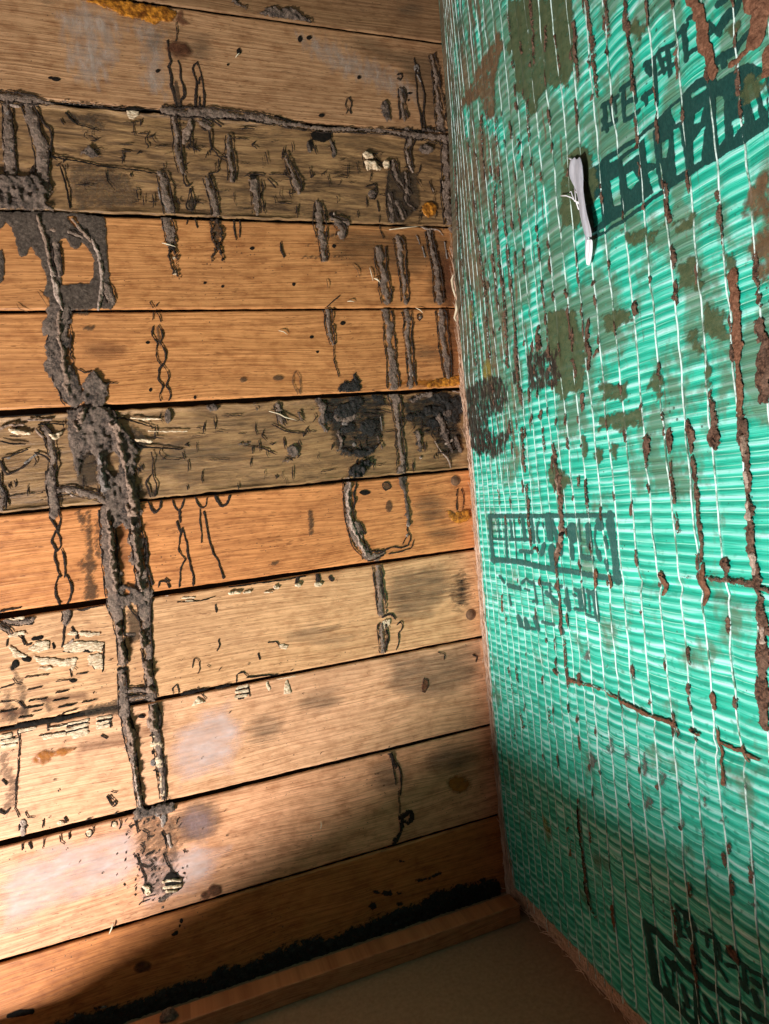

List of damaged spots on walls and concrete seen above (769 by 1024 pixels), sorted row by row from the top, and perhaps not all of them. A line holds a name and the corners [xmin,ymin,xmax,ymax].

water stain [314,373,386,458]
water stain [400,349,561,468]
peeling [0,607,118,757]
water stain [54,872,502,1024]